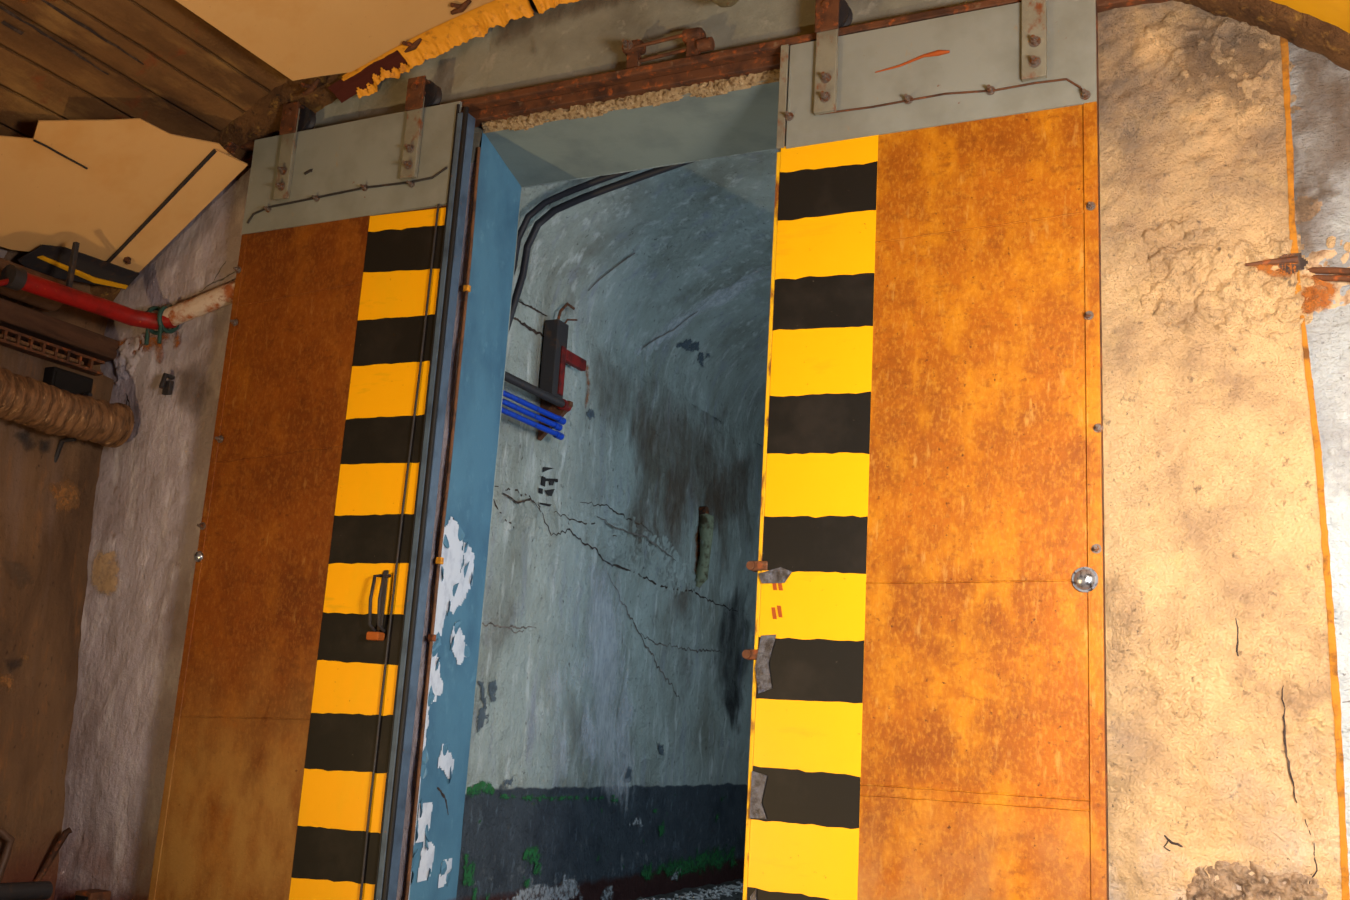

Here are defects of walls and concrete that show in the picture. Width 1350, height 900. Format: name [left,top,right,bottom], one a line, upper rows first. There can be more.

spalling [328,50,407,103]
rust [1255,254,1336,313]
rust [155,216,370,900]
peeling [408,517,490,900]
crack [464,570,536,634]
damp [512,875,583,900]
crack [493,486,732,698]
rust [857,104,1091,900]
spalling [1178,669,1342,900]
crack [1280,37,1350,900]